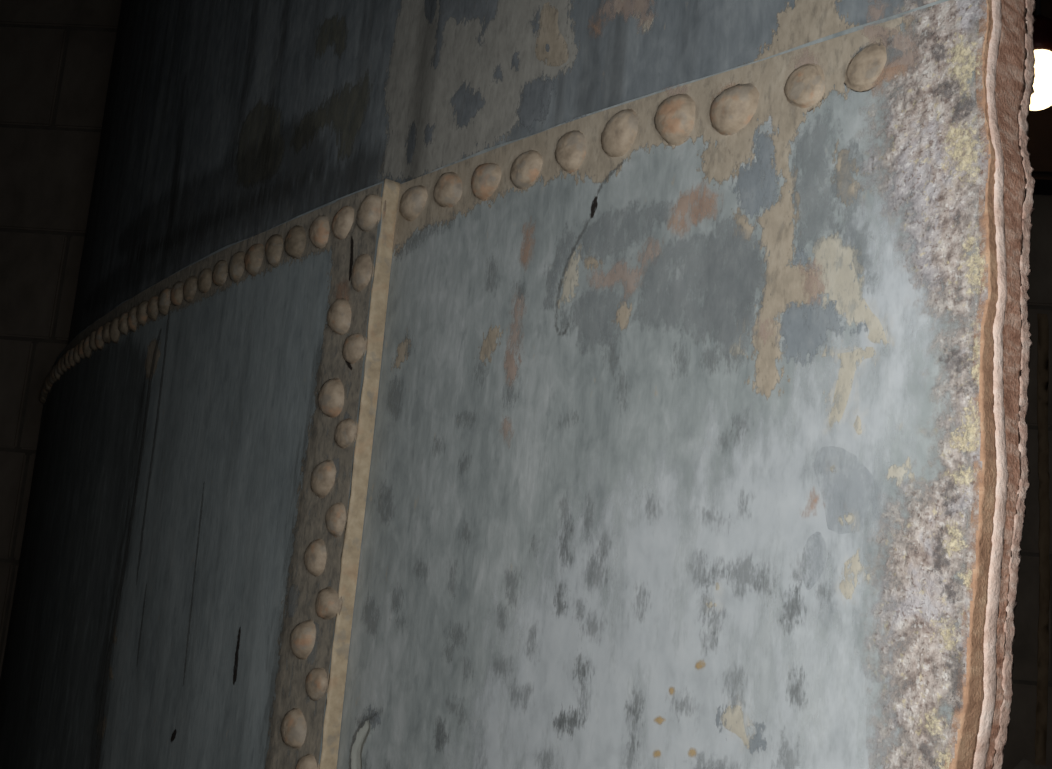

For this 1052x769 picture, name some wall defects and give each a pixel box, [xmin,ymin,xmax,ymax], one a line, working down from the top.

crack [590,196,598,218]
crack [557,243,582,309]
peeling [265,0,915,769]